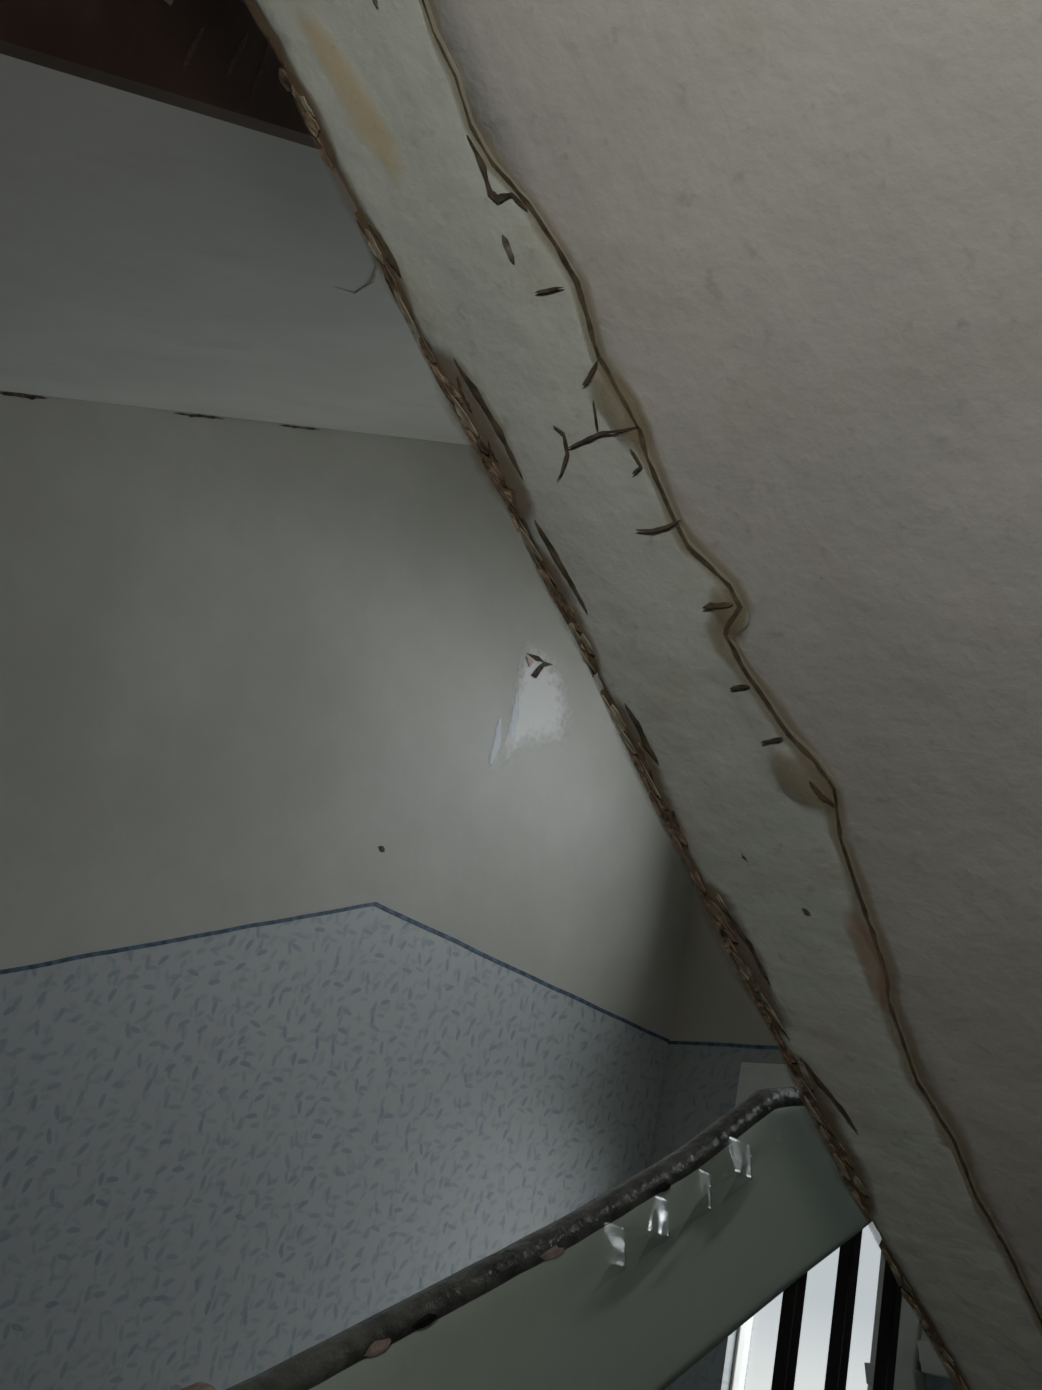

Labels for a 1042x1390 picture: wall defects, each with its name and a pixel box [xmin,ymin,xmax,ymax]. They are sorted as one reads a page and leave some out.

crack [422,0,1042,1325]